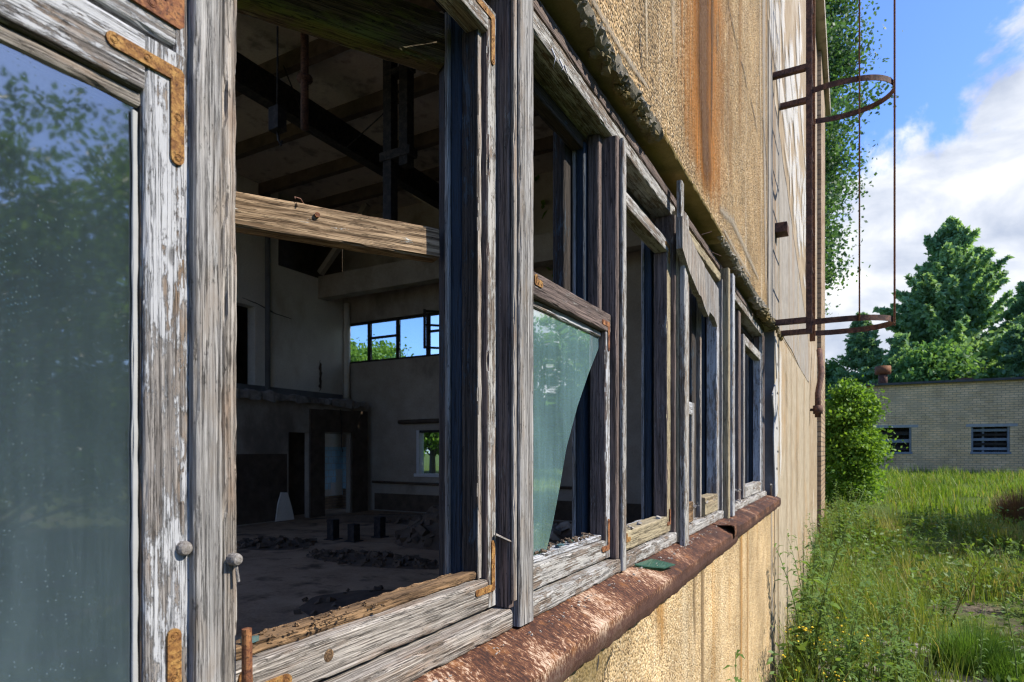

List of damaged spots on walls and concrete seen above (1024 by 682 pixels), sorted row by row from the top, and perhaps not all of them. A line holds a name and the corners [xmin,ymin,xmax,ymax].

corrosion [681,0,721,195]